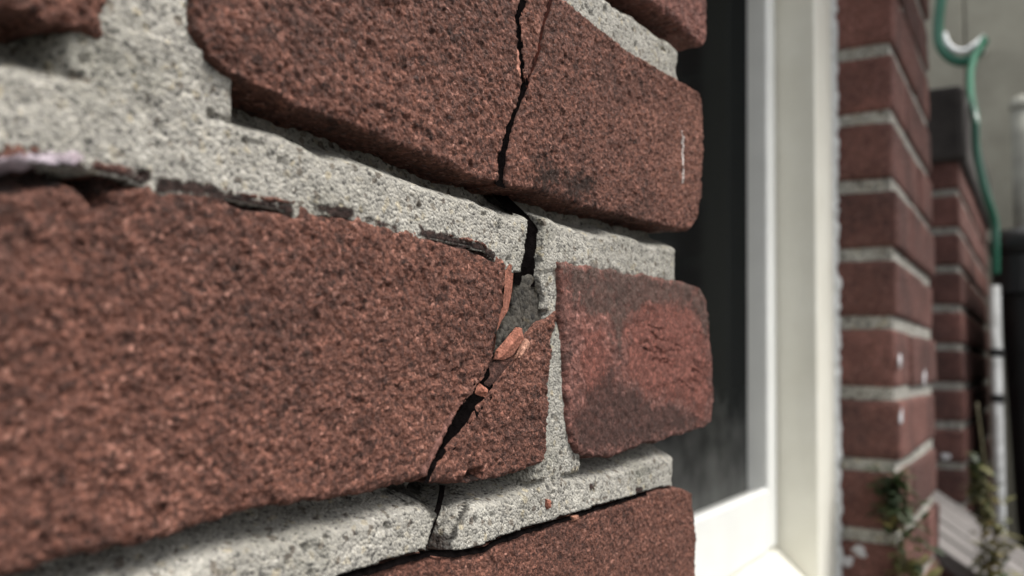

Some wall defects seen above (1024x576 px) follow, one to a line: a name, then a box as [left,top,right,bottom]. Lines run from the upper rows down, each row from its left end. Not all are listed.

crack [338,0,647,576]